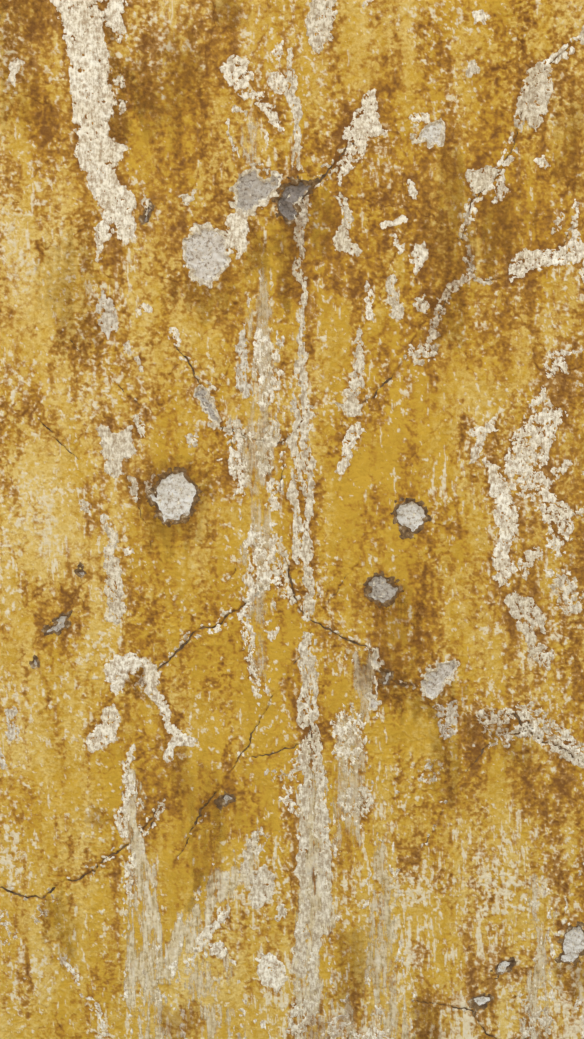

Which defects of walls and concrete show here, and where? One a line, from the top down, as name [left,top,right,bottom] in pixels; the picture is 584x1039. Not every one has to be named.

peeling [50,0,155,263]
crack [295,130,368,226]
peeling [379,215,429,275]
crack [353,25,584,413]
peeling [508,199,584,283]
spalling [96,398,203,528]
peeling [113,40,416,1039]
peeling [469,348,584,671]
crack [134,550,416,689]
peeling [86,652,198,763]
crack [467,707,584,771]
crack [0,797,166,901]